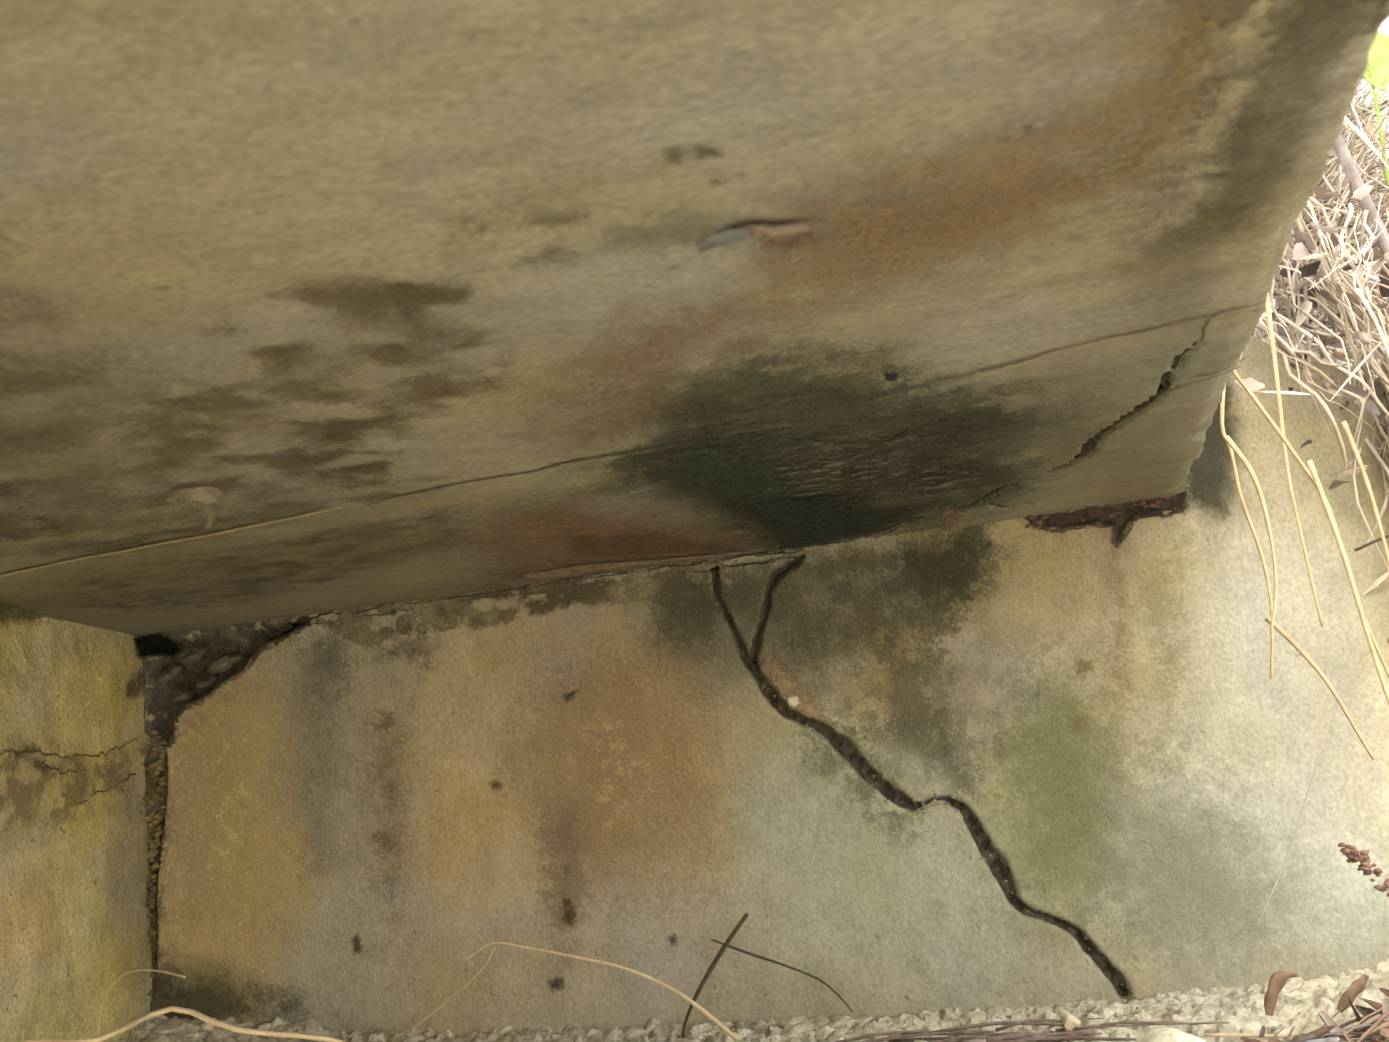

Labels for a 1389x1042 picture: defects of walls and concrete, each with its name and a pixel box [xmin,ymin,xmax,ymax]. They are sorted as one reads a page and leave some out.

water stain [286,283,475,366]
water stain [0,346,406,554]
crack [363,438,697,506]
crack [865,300,1271,538]
crack [0,738,137,805]
crack [296,548,1138,999]
water stain [867,638,968,790]